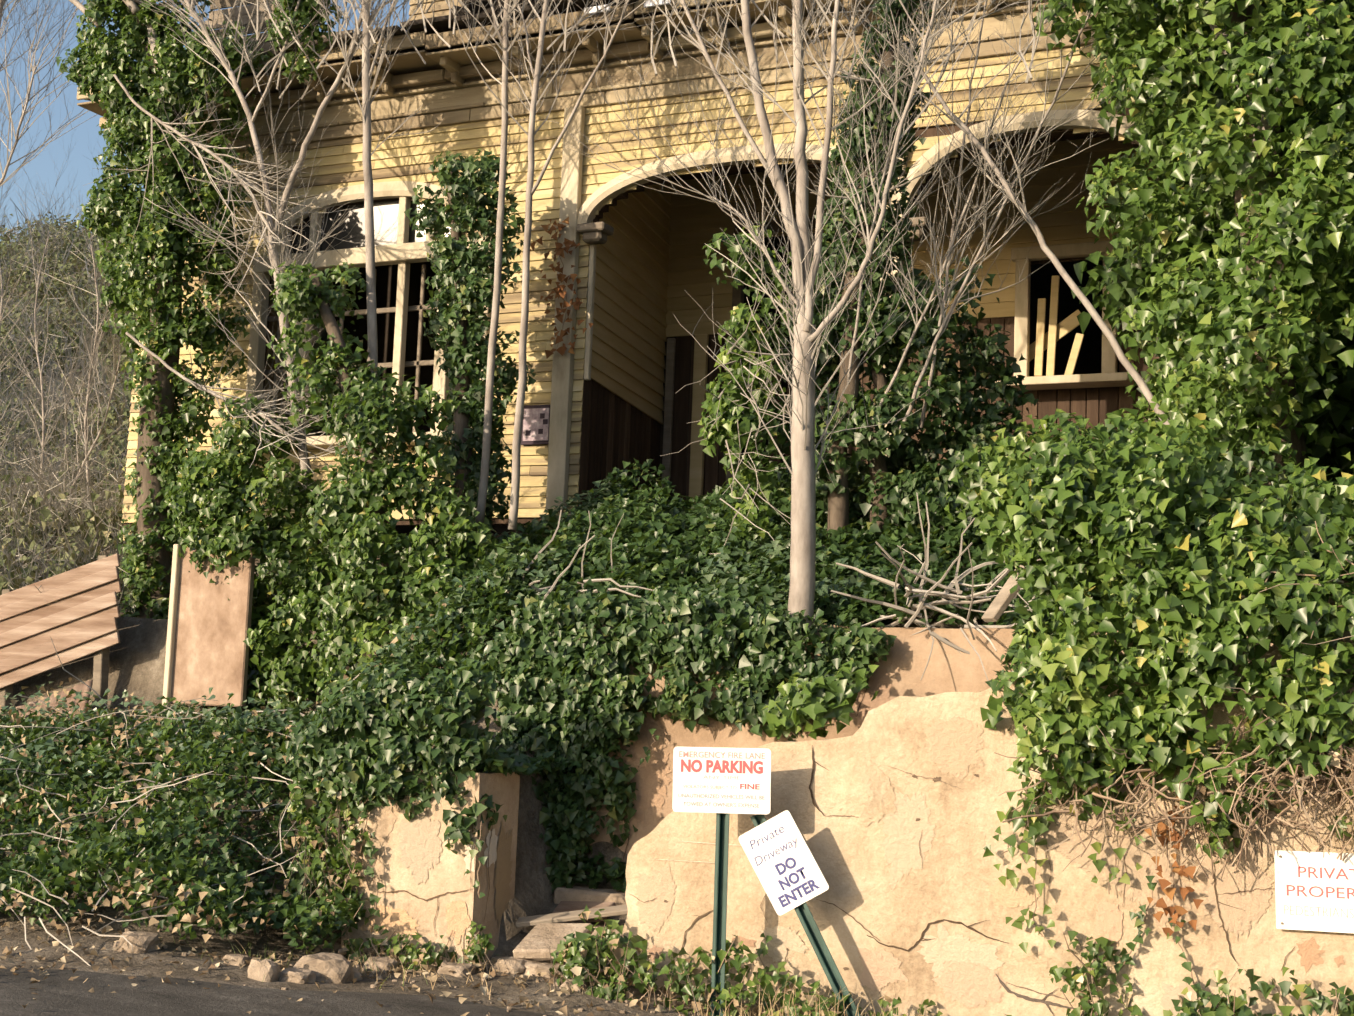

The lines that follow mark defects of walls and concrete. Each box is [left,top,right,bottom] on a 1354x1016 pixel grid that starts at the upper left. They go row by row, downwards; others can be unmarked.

crack [809,748,871,819]
crack [369,823,493,930]
crack [816,899,1007,952]
crack [996,974,1072,1016]